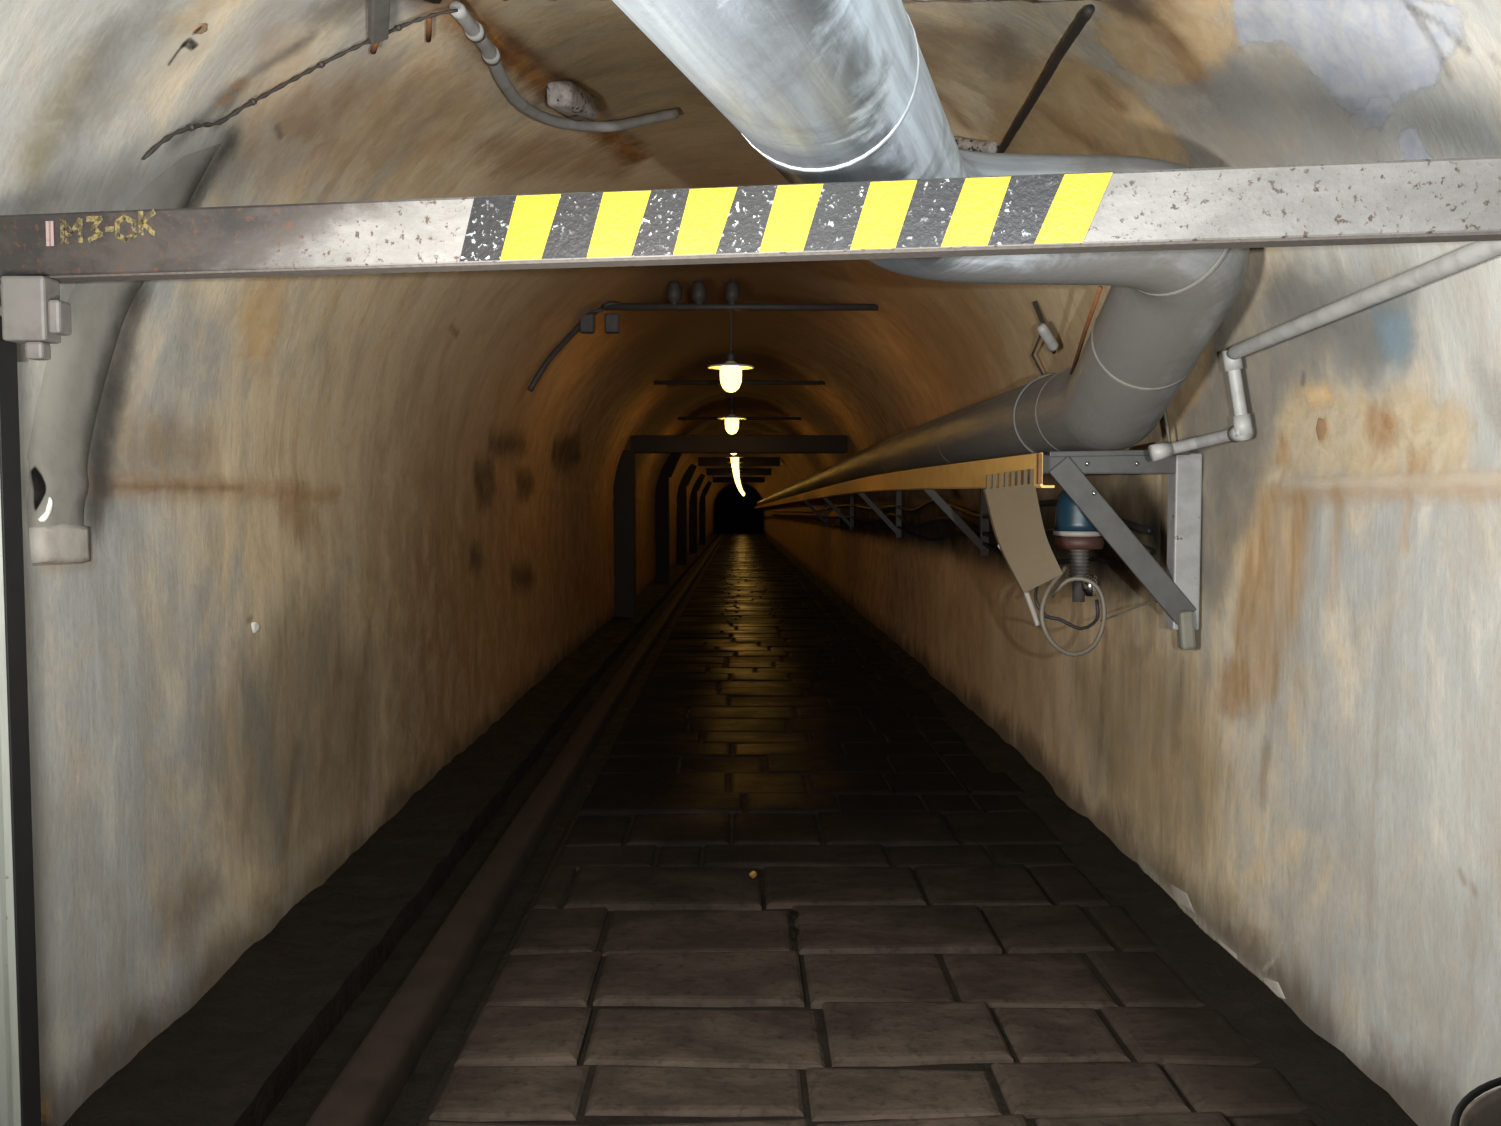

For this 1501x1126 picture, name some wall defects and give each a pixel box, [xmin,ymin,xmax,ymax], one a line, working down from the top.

water stain [991,59,1181,163]
water stain [1101,0,1222,80]
peeling [1219,0,1461,135]